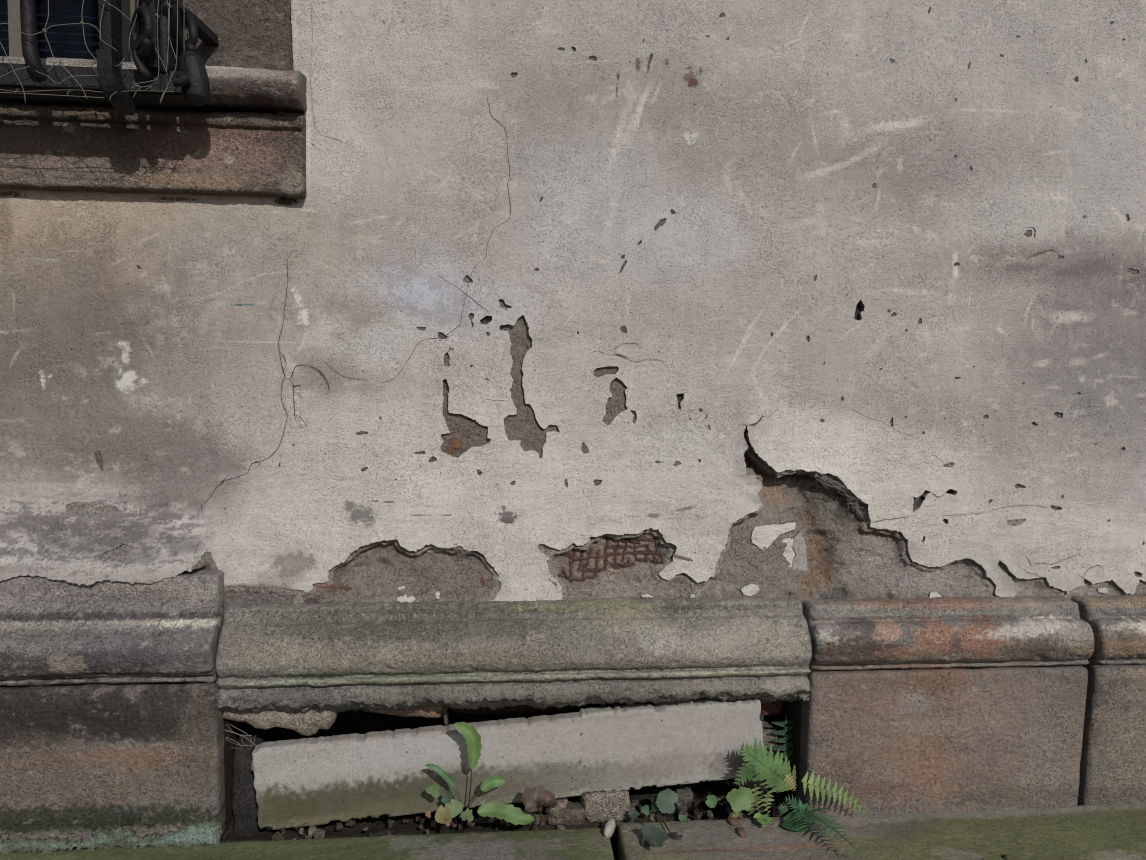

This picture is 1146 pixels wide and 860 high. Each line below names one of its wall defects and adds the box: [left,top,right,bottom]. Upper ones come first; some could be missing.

leakage [274,197,298,205]
crack [200,90,511,511]
leakage [115,341,149,394]
spalling [414,327,491,462]
spalling [468,299,560,458]
spalling [593,366,636,425]
spalling [538,430,996,603]
spalling [192,552,218,570]
spalling [223,539,501,622]
rust [558,537,664,582]
spalling [998,560,1146,600]